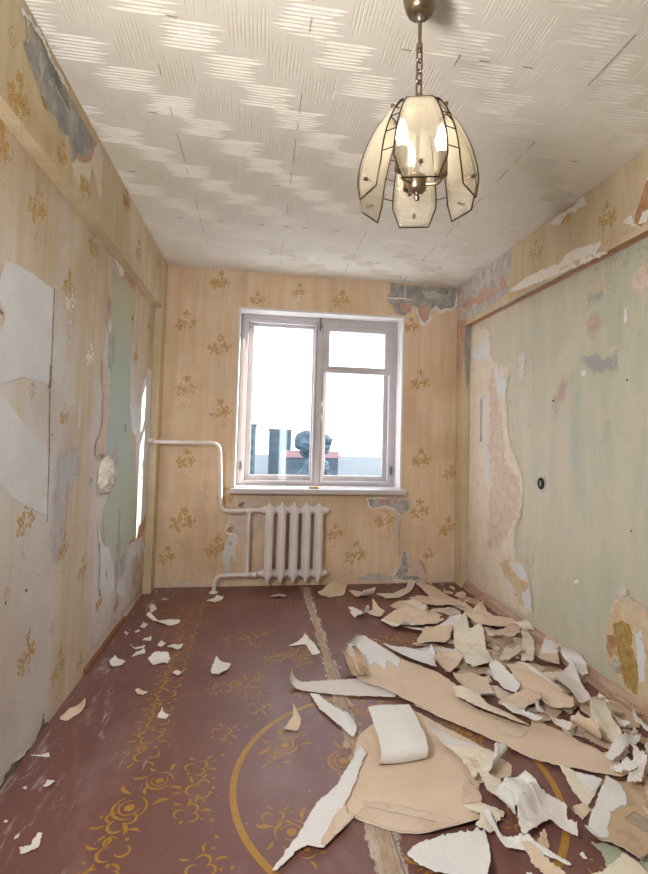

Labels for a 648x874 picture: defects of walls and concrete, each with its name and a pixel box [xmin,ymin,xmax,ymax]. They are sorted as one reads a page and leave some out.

flaking render [21,8,96,163]
flaking render [387,210,648,390]
flaking render [391,547,428,583]